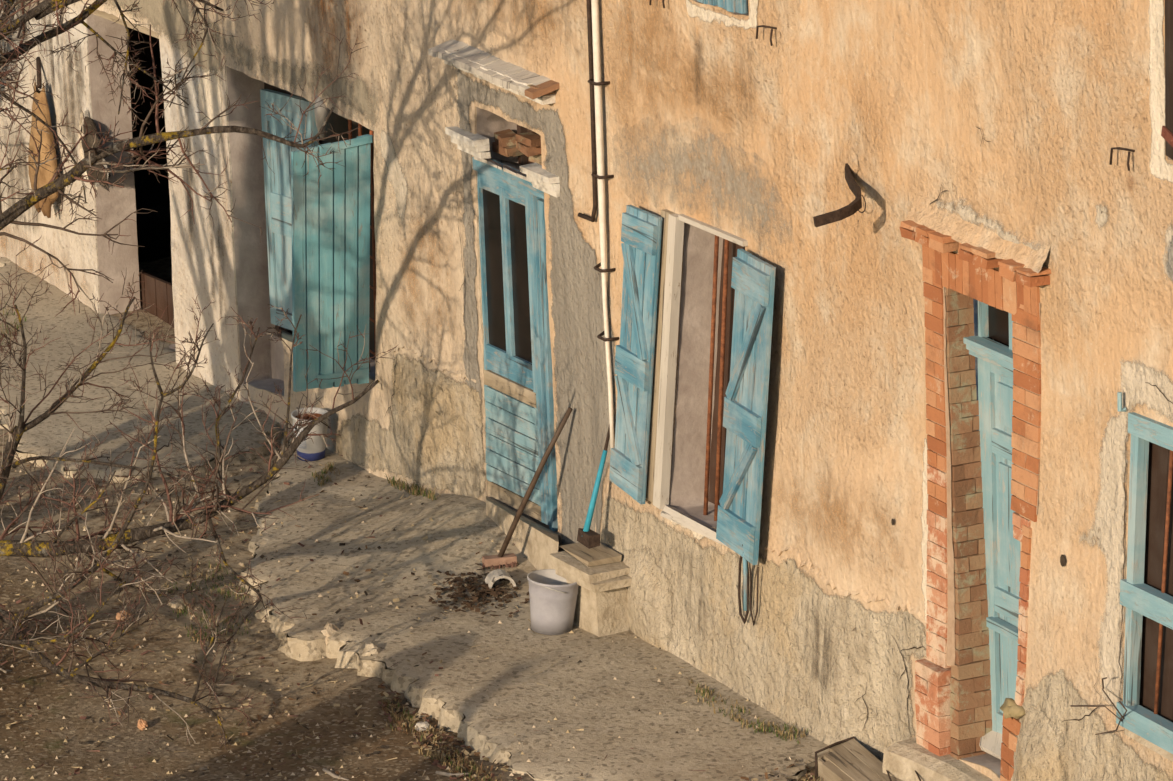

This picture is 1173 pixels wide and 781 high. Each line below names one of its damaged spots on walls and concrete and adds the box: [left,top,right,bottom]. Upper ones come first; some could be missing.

flaking render [335,342,486,499]
flaking render [600,438,936,760]
crack [1062,436,1127,722]
flaking render [1022,669,1172,781]